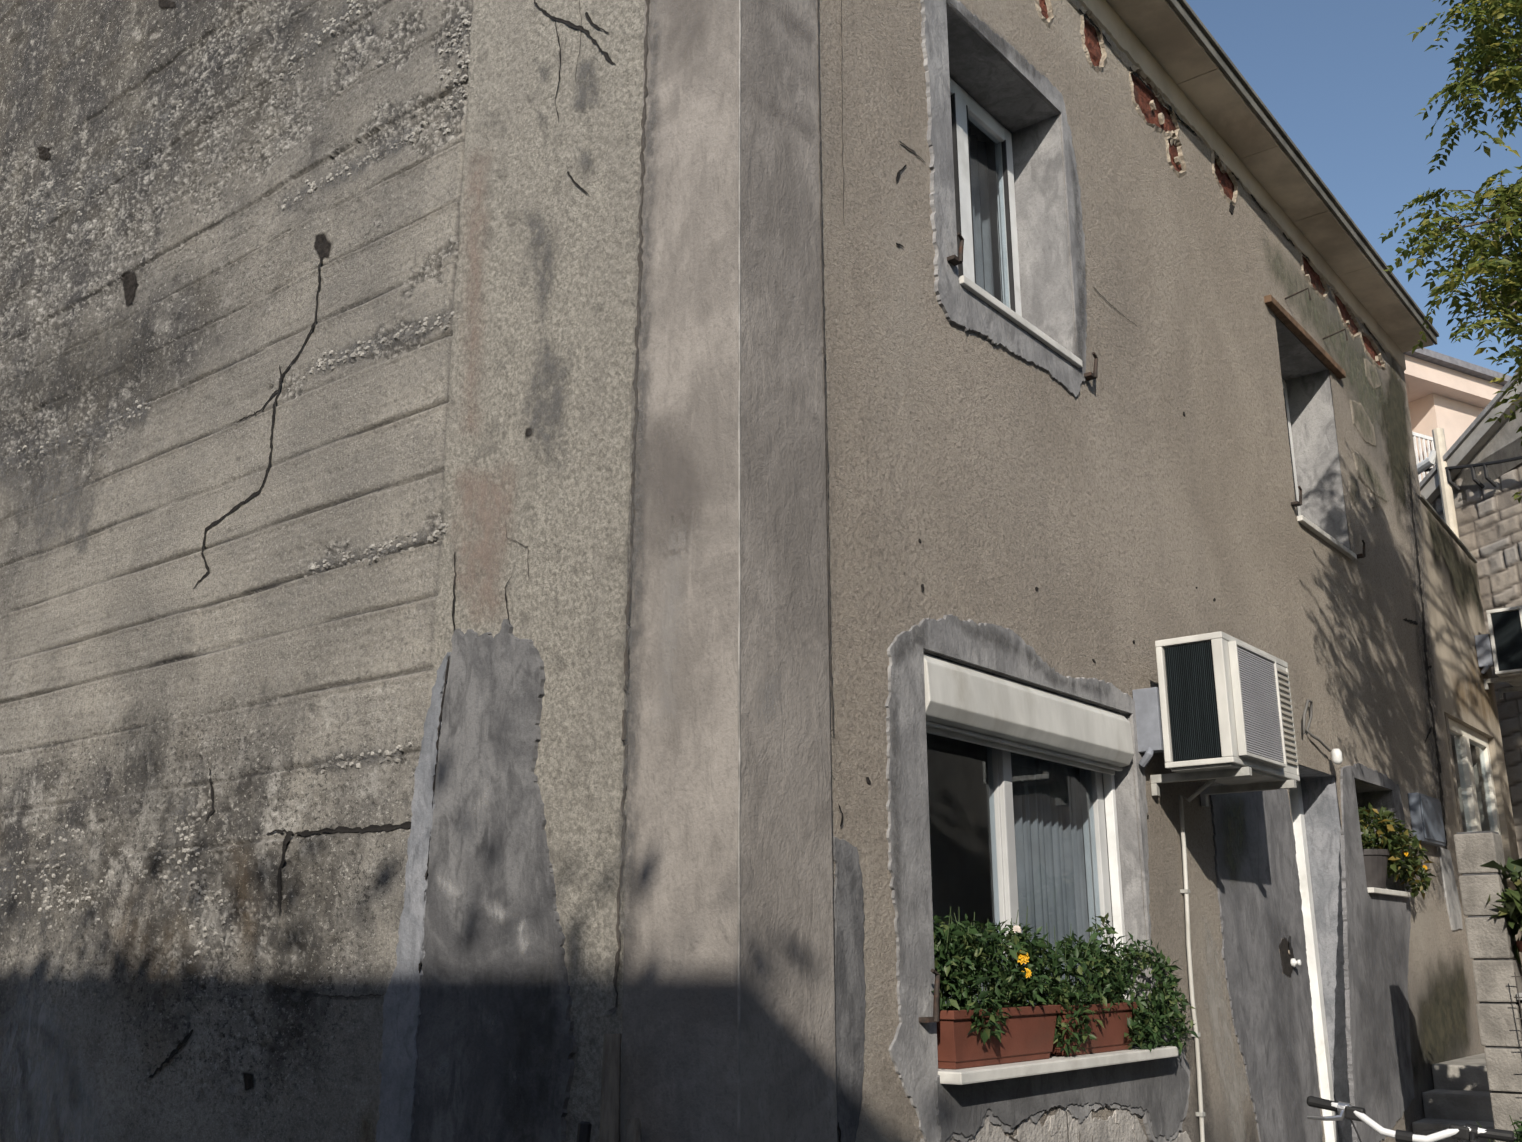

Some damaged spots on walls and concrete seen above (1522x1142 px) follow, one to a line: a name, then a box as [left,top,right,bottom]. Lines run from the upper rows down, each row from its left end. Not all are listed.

spalling [1035,0,1054,29]
spalling [1079,6,1107,74]
spalling [1129,65,1186,178]
spalling [1211,150,1239,215]
spalling [1300,252,1386,370]
crack [193,233,331,589]
crack [534,0,650,1013]
crack [267,821,411,915]
peeling [949,1108,1147,1142]
peeling [1171,1131,1191,1142]